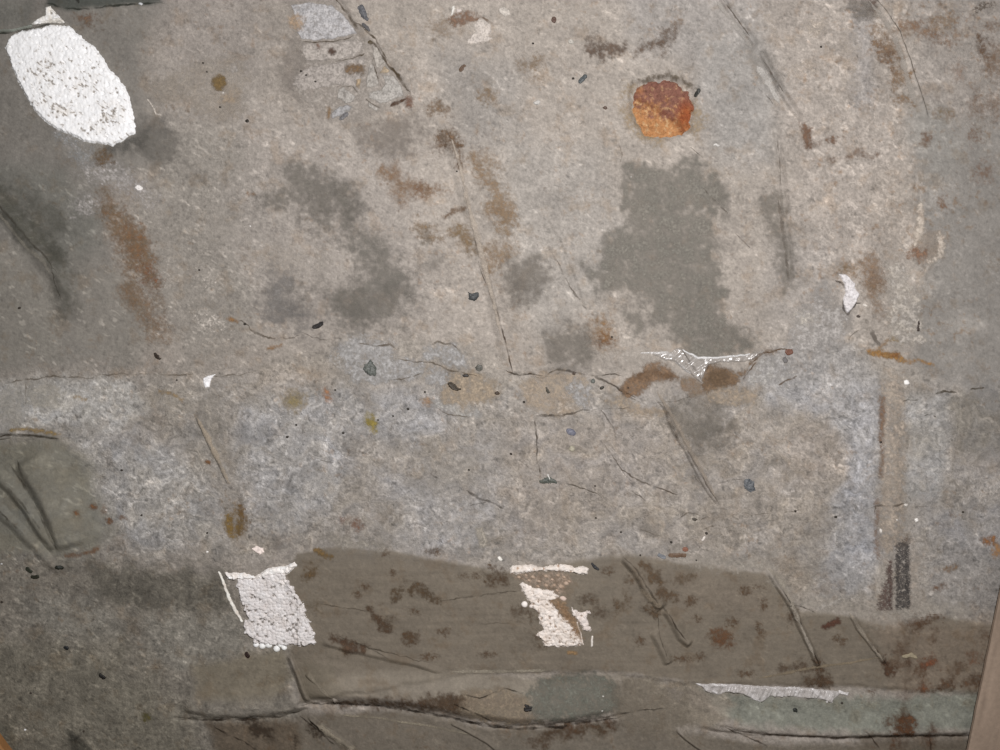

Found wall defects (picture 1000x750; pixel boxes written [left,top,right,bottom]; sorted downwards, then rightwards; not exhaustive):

leakage [331,226,409,324]
leakage [582,156,752,361]
crack [474,237,570,378]
rust [623,362,751,397]
rust [366,606,416,645]
peeling [571,608,593,647]
rust [331,637,366,655]
rust [800,661,833,687]
rust [882,658,982,692]
crack [182,718,254,740]
crack [457,697,646,729]
crack [727,728,875,742]